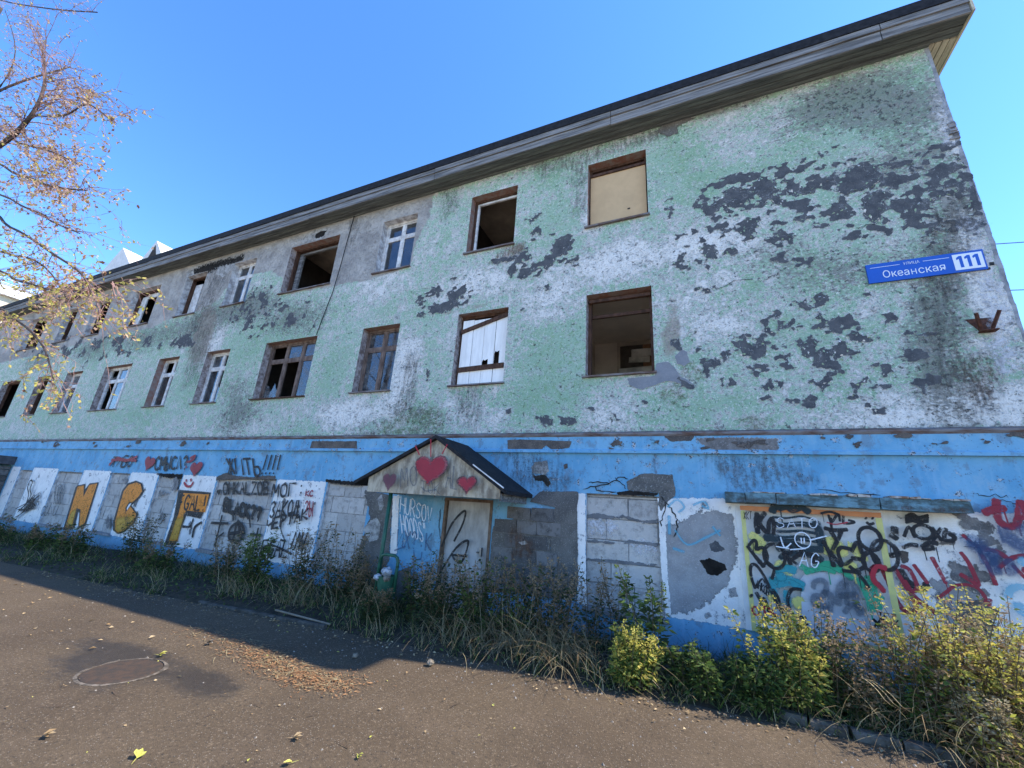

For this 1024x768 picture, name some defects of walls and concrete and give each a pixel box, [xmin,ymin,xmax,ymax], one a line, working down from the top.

peeling [672,121,987,271]
peeling [491,212,579,291]
peeling [229,285,315,339]
peeling [415,275,473,317]
damp [940,199,1017,374]
peeling [14,333,195,369]
peeling [627,292,937,415]
peeling [910,373,944,395]
peeling [535,415,577,427]
crack [586,477,627,493]
spalling [617,473,676,511]
spalling [665,510,739,619]